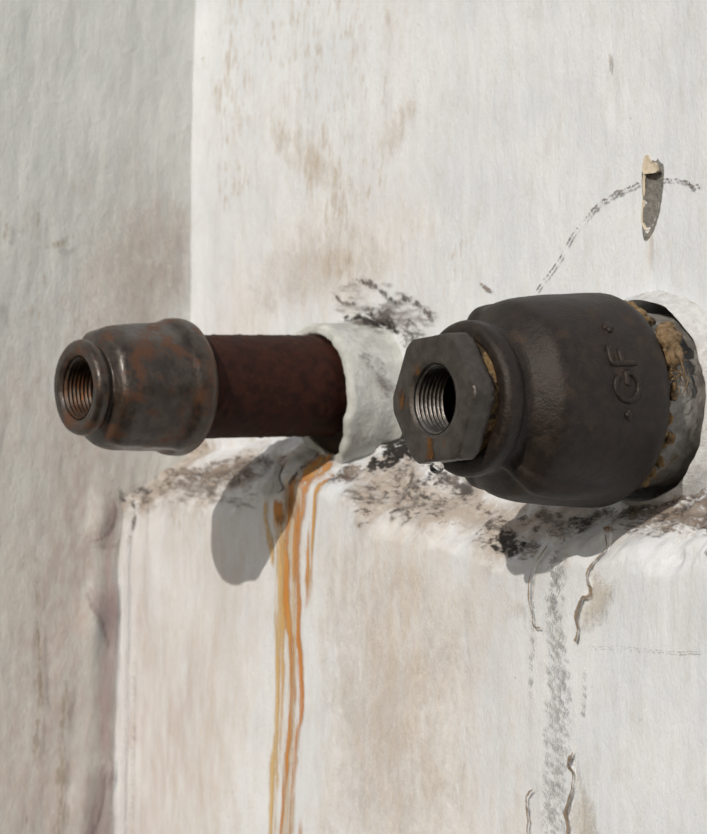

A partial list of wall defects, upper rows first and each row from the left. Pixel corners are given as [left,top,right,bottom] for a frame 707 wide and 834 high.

crack [536,182,639,291]
flaking render [641,155,664,241]
crack [661,178,700,189]
leakage [335,278,433,347]
leakage [336,434,477,522]
leakage [484,519,541,560]
peeling [573,530,612,643]
rust [264,453,333,834]
leakage [536,494,696,834]
peeling [563,743,592,834]